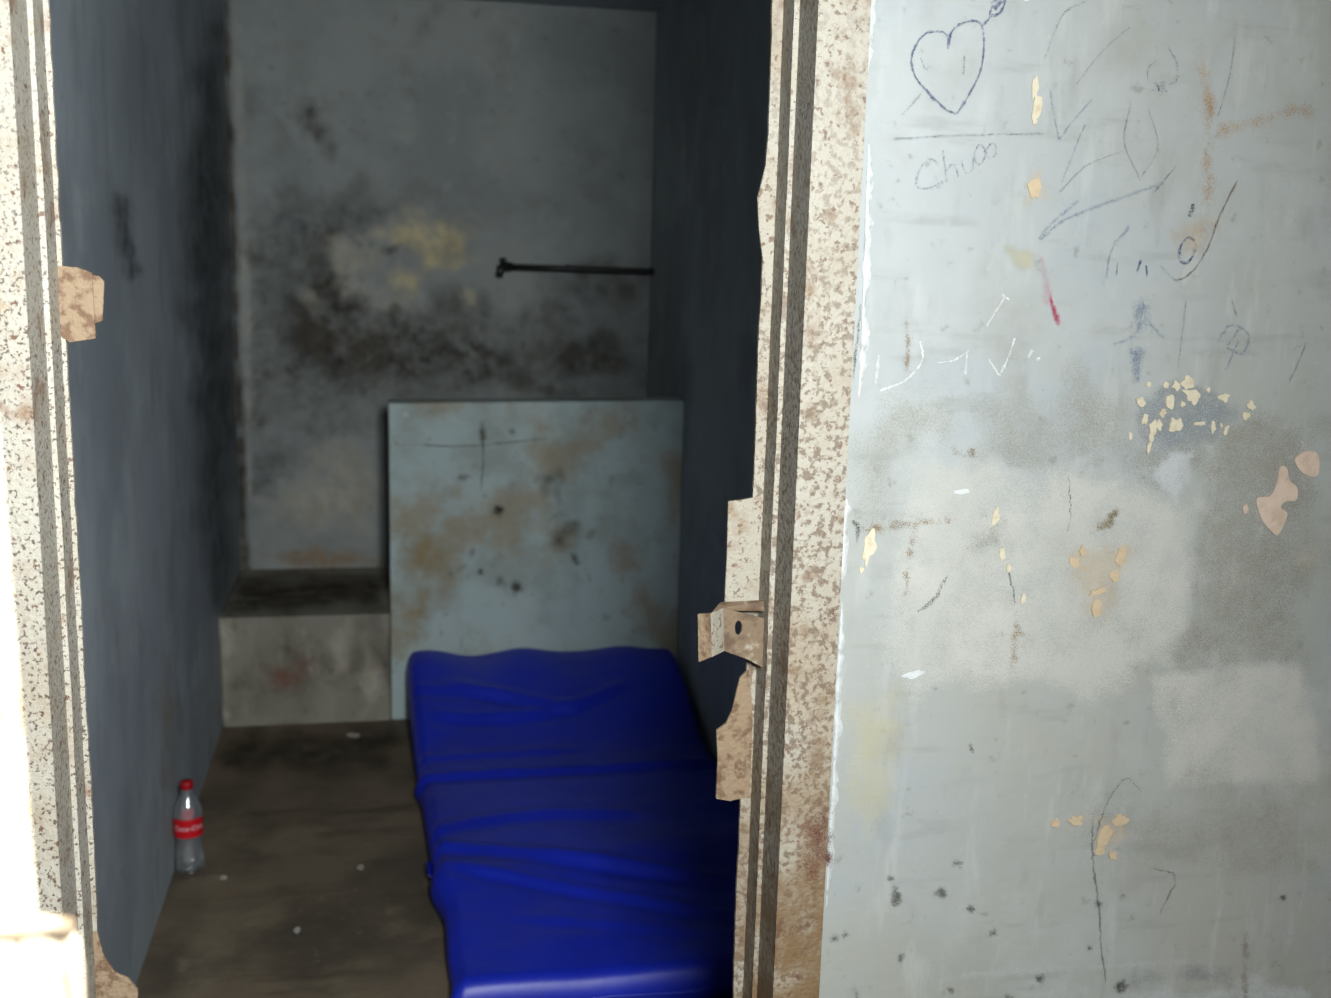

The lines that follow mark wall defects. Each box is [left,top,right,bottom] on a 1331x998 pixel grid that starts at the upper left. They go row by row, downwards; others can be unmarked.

peeling [1128,372,1256,455]
flaking render [1242,451,1320,535]
flaking render [1065,540,1137,623]
corrosion [796,801,837,884]
flaking render [1050,812,1132,860]
crack [1091,779,1135,982]